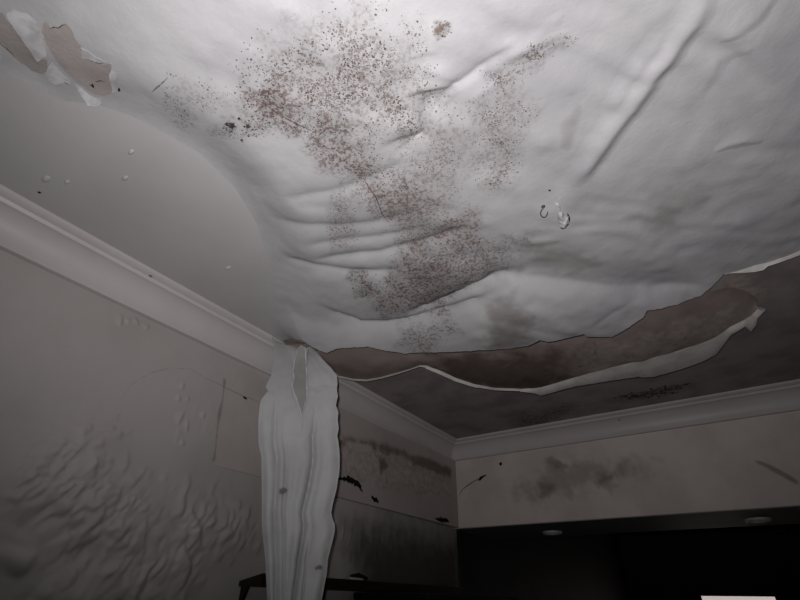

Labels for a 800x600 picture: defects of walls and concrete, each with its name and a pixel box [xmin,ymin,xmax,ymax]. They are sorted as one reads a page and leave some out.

peeling [0,9,120,107]
water stain [211,0,506,319]
mould [454,36,576,191]
peeling [354,255,800,439]